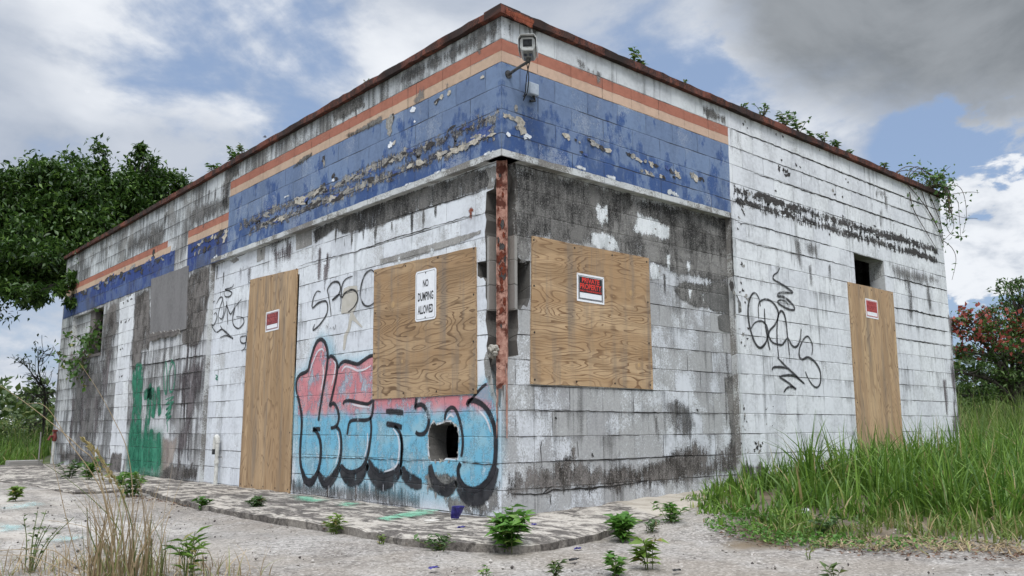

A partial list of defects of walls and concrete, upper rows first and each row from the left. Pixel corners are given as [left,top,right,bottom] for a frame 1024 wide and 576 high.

peeling [182,105,533,378]
corrosion [497,173,506,328]
damp [518,170,726,280]
peeling [547,133,938,346]
damp [795,240,820,284]
damp [59,303,205,481]
peeling [425,420,500,515]
damp [506,353,765,499]